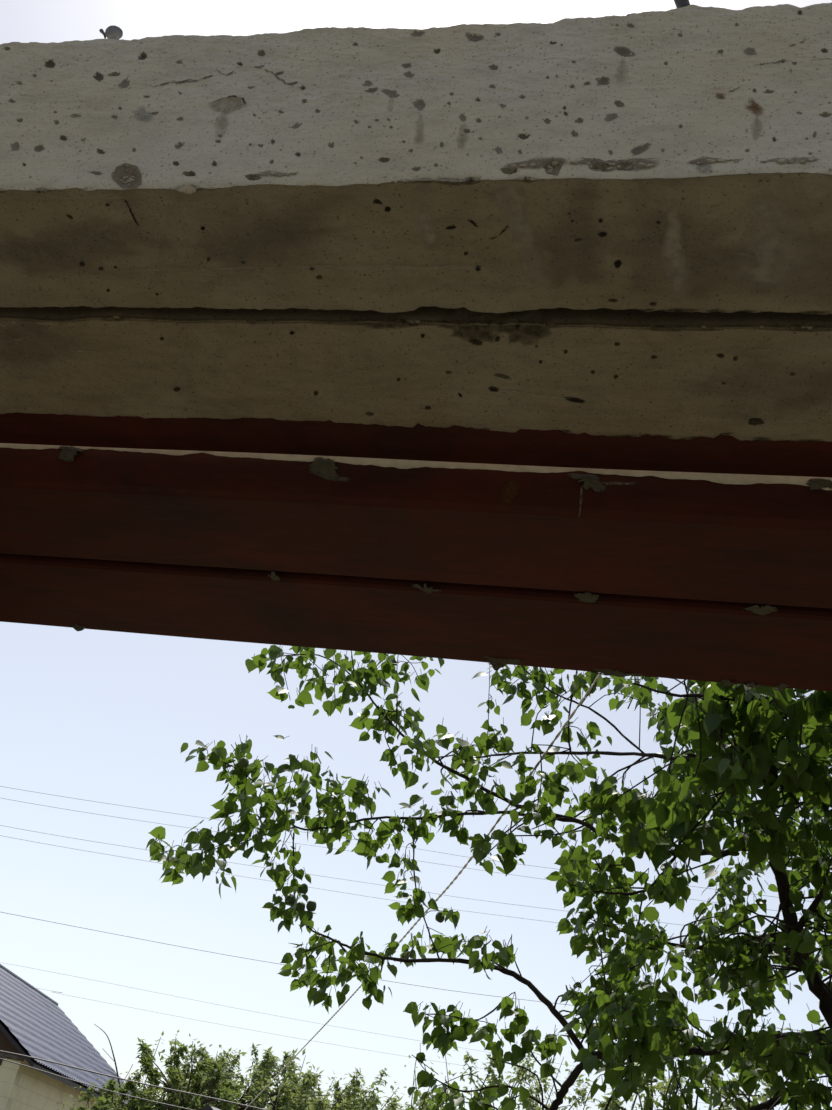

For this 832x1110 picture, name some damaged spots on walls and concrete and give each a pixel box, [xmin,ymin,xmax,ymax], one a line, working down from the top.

spalling [689,149,749,172]
spalling [760,132,817,165]